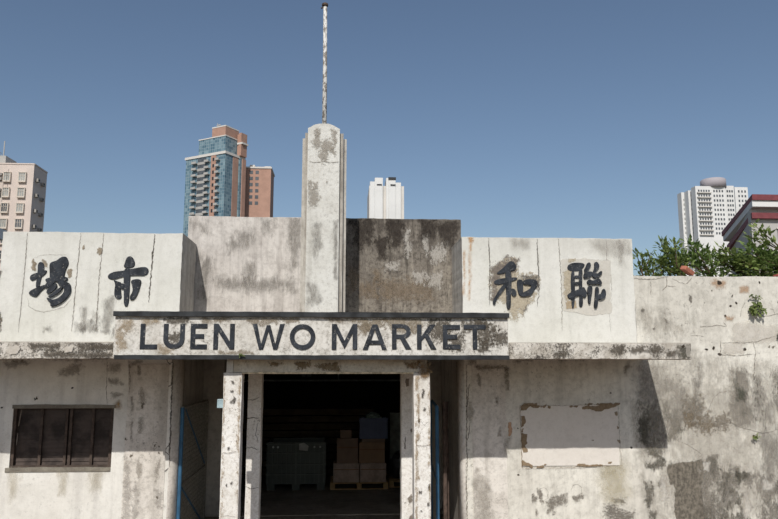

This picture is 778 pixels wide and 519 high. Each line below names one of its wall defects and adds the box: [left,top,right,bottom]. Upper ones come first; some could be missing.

water stain [348,218,459,291]
peeling [488,255,541,320]
peeling [508,403,551,476]
peeling [569,392,620,416]
water stain [636,368,778,470]
water stain [645,480,661,519]
water stain [711,435,778,519]